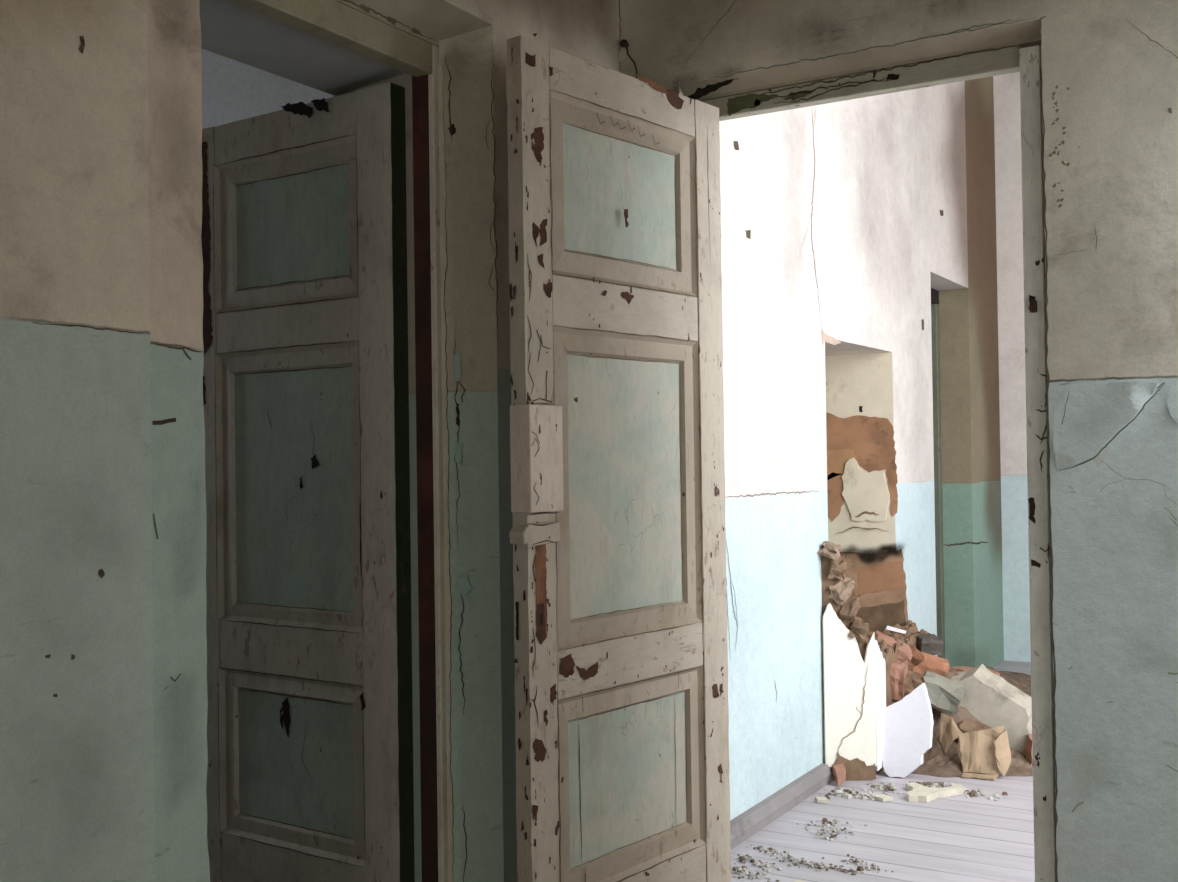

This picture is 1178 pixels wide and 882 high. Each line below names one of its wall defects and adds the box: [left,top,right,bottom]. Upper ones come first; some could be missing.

peeling [635,16,1046,114]
crack [732,32,1178,882]
flaking render [840,552,908,632]
flaking render [832,753,876,781]